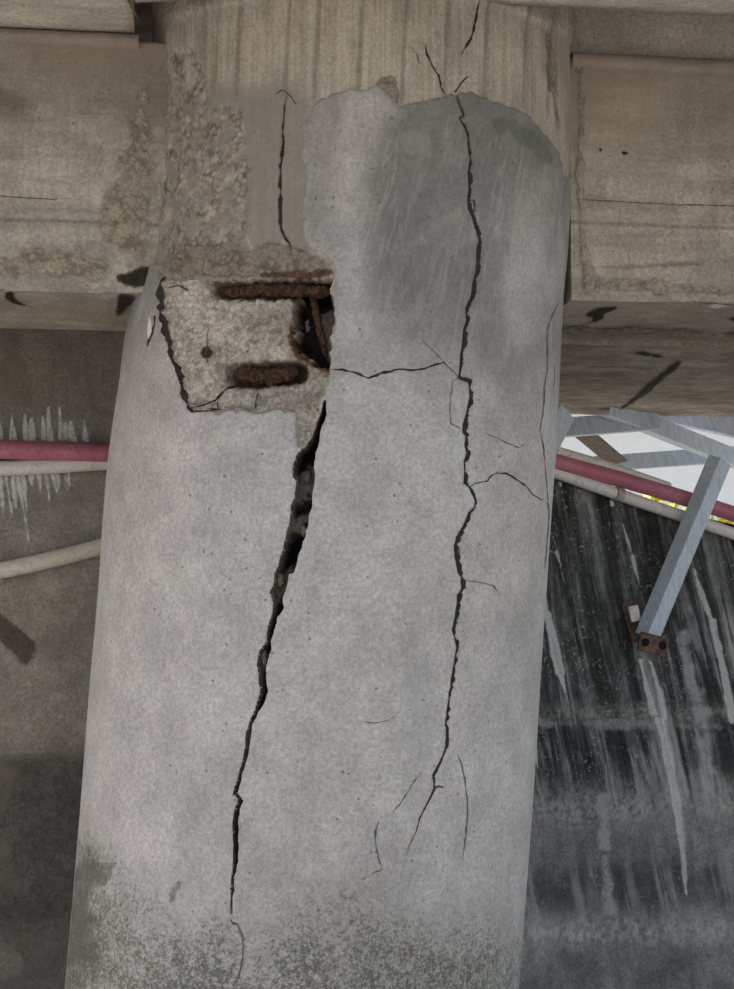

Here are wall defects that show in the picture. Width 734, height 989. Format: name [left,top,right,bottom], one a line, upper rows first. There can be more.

water stain [0,472,70,541]
water stain [0,406,89,442]
spalling [0,91,154,315]
spalling [147,243,336,449]
crack [275,90,296,247]
rust [261,269,332,280]
rust [289,325,327,372]
crack [331,1,559,880]
crack [230,400,327,981]
water stain [545,600,566,691]
water stain [694,570,734,723]
water stain [639,659,687,894]